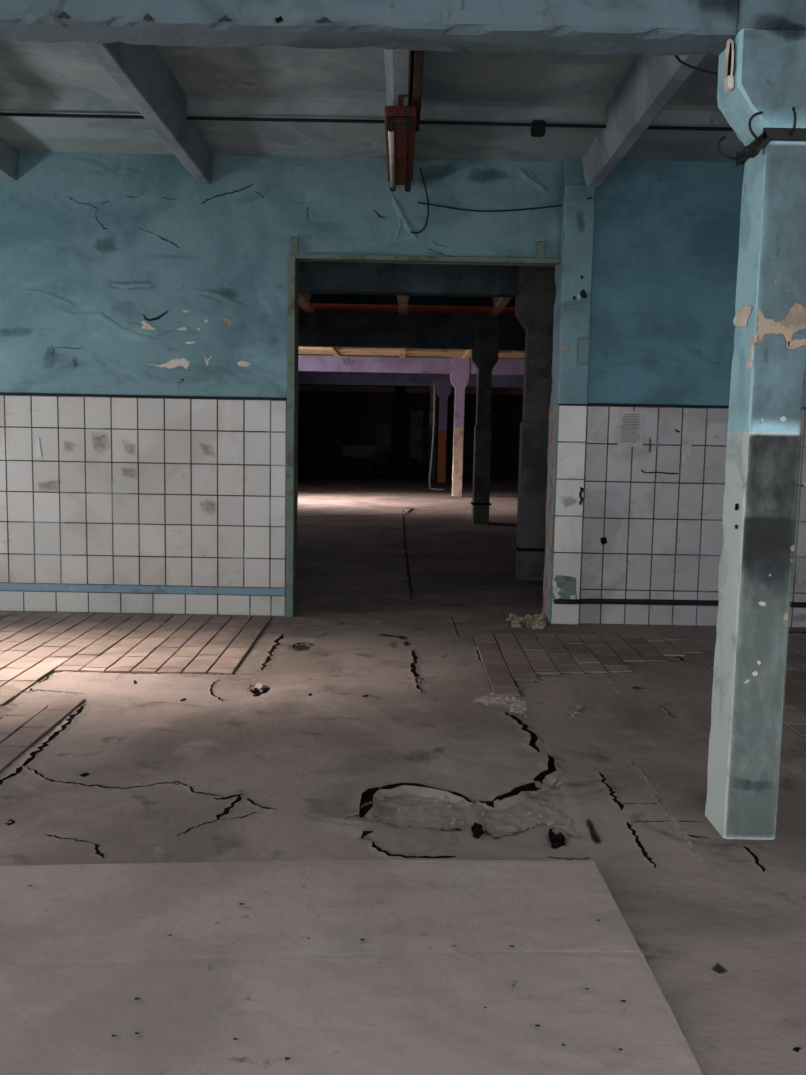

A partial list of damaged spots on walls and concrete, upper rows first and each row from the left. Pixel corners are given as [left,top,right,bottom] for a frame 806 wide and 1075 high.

crack [68,181,265,231]
crack [138,228,180,249]
peeling [733,303,806,370]
peeling [150,358,190,369]
crack [404,649,429,695]
crack [22,765,277,836]
spalling [343,711,600,861]